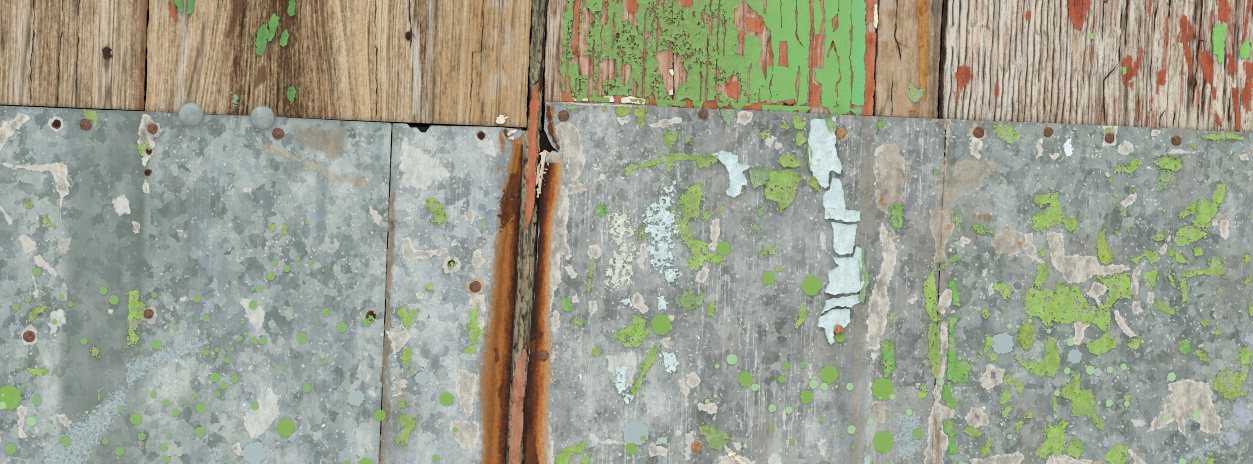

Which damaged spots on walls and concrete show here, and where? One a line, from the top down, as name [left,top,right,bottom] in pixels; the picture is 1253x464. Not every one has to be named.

peeling [169,0,194,22]
peeling [255,0,296,56]
peeling [1068,0,1108,39]
corrosion [909,0,928,115]
peeling [954,66,973,102]
peeling [1112,46,1144,89]
peeling [1145,69,1167,125]
peeling [1172,0,1253,149]
peeling [990,122,1039,144]
peeling [557,0,887,406]
corrosion [476,104,565,464]
peeling [916,154,1253,464]